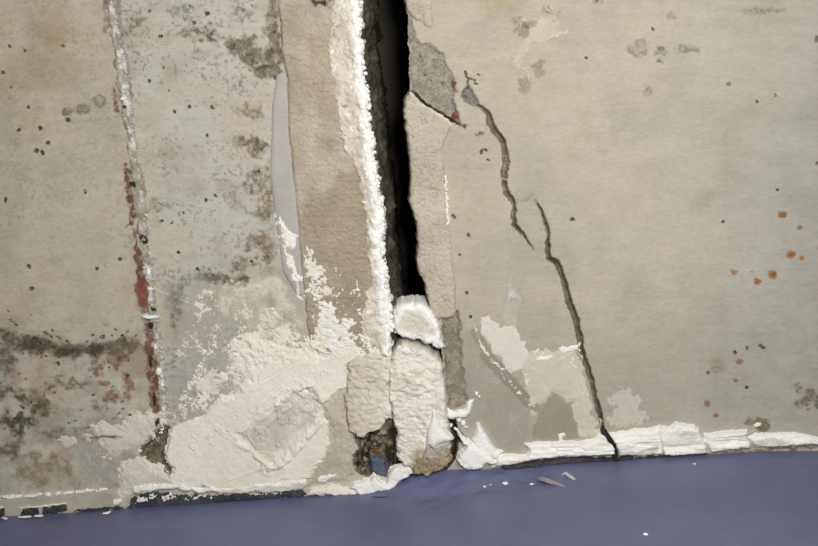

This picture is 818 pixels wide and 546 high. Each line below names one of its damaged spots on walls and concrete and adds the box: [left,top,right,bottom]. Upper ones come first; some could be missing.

corrosion [124,163,149,313]
crack [361,0,444,373]
peeling [402,9,469,410]
crack [460,70,619,462]
corrosion [144,323,160,413]
spalling [139,424,172,474]
spalling [351,413,402,477]
crack [392,426,400,465]